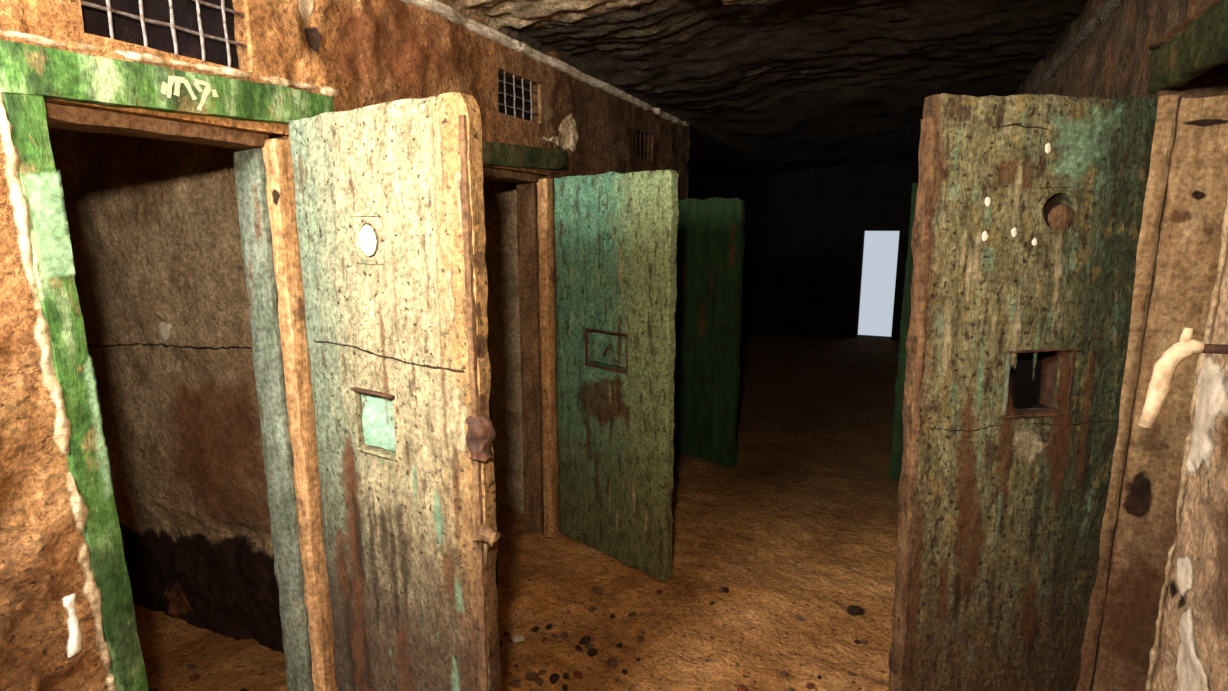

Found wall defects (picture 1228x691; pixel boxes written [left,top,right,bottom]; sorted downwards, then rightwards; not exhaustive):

crack [87,342,252,350]
rust [580,379,629,497]
flaking render [1186,357,1228,478]
rust [336,440,369,691]
flaking render [1170,556,1209,691]